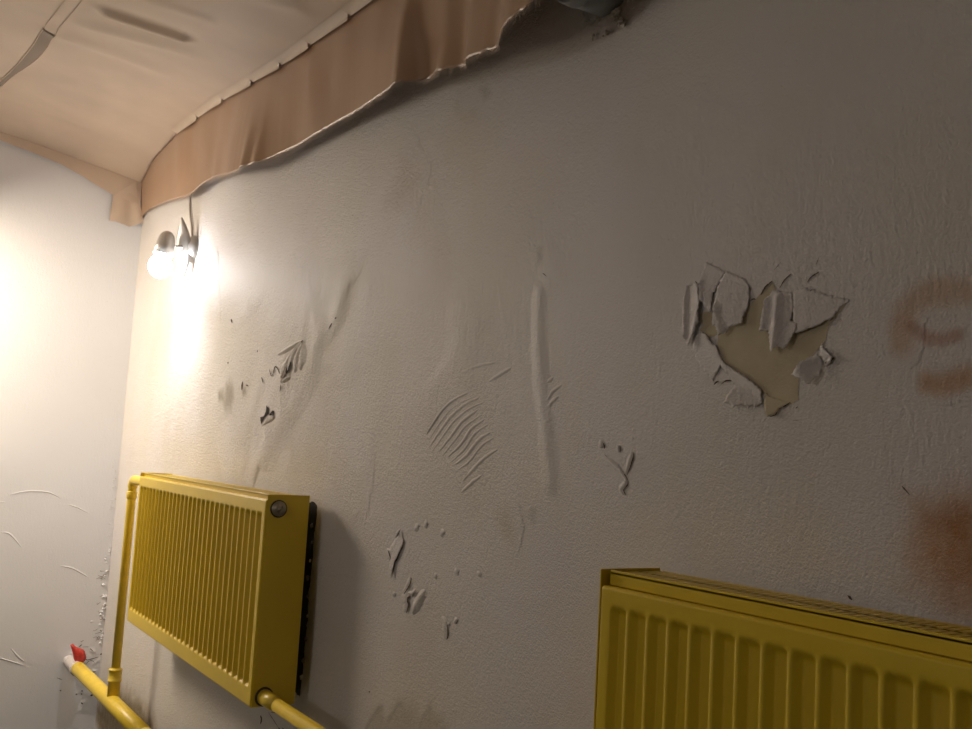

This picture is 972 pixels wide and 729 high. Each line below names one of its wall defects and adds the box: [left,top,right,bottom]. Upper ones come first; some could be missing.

peeling [682,258,849,417]
peeling [261,340,307,390]
rust [910,352,972,406]
peeling [260,406,274,426]
rust [868,432,972,627]